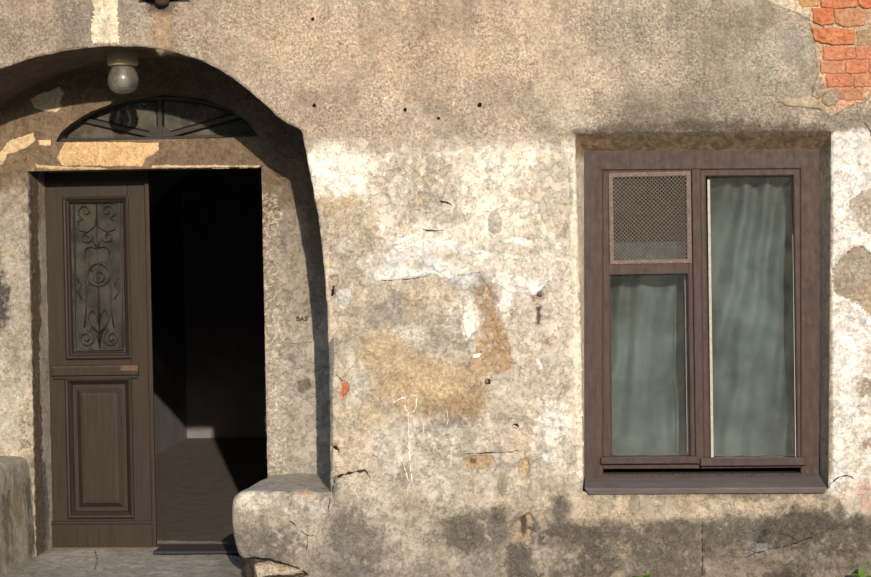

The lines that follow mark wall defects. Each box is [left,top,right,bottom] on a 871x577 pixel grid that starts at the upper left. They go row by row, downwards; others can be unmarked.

flaking render [768,0,871,117]
flaking render [0,133,51,164]
flaking render [850,189,871,234]
peeling [378,235,560,384]
flaking render [832,246,871,315]
flaking render [29,142,260,556]
crack [328,469,370,511]
damp [441,511,541,577]
damp [528,522,620,577]
damp [627,512,769,577]